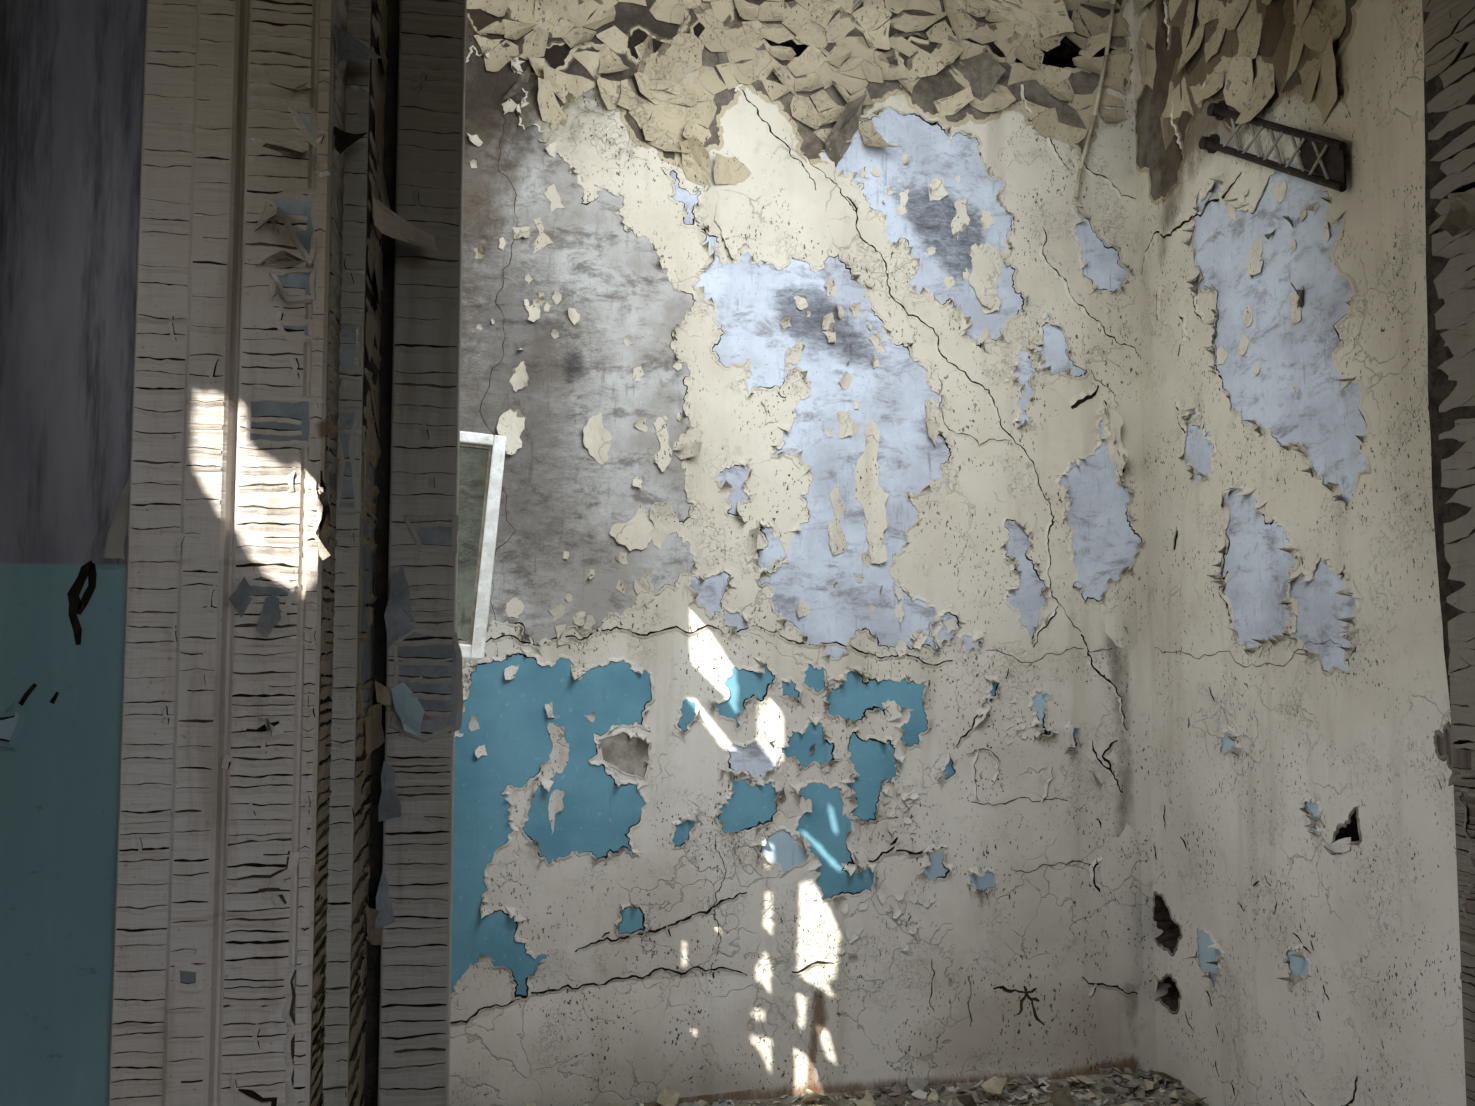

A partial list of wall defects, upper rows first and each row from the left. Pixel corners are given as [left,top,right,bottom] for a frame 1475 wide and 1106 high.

peeling [262,143,307,156]
damp [463,9,512,232]
peeling [256,250,316,304]
peeling [1440,320,1475,359]
peeling [243,394,313,448]
peeling [334,0,1372,1014]
crack [715,52,1141,908]
crack [929,958,1045,1027]